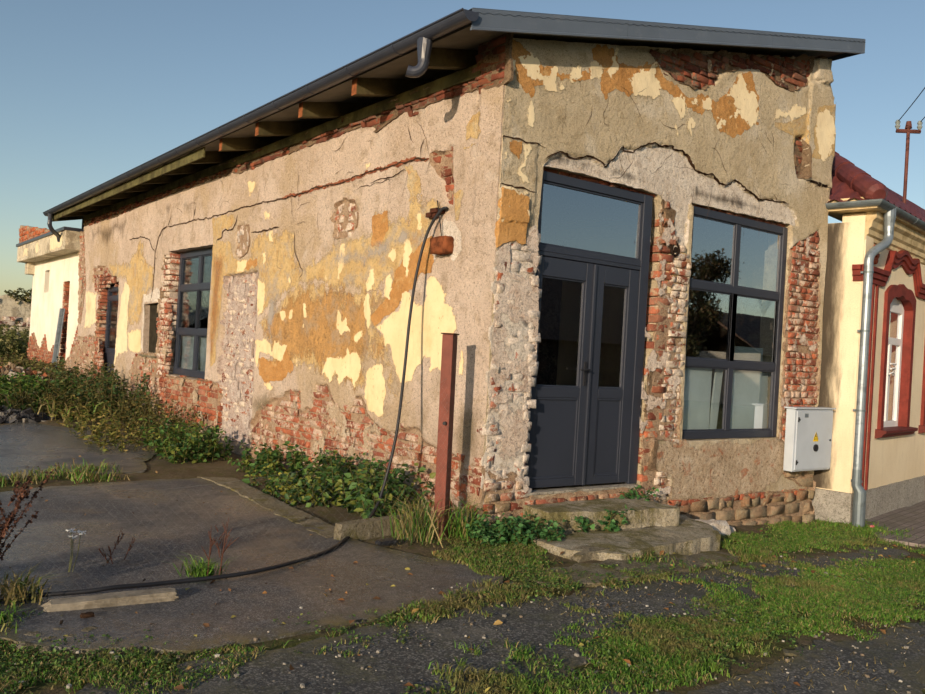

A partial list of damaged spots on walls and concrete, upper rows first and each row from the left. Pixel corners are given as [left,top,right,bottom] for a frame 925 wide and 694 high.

crack [108,122,430,301]
flaking render [0,33,619,431]
flaking render [249,268,457,516]
crack [503,135,545,148]
flaking render [449,48,836,531]
crack [804,180,830,190]